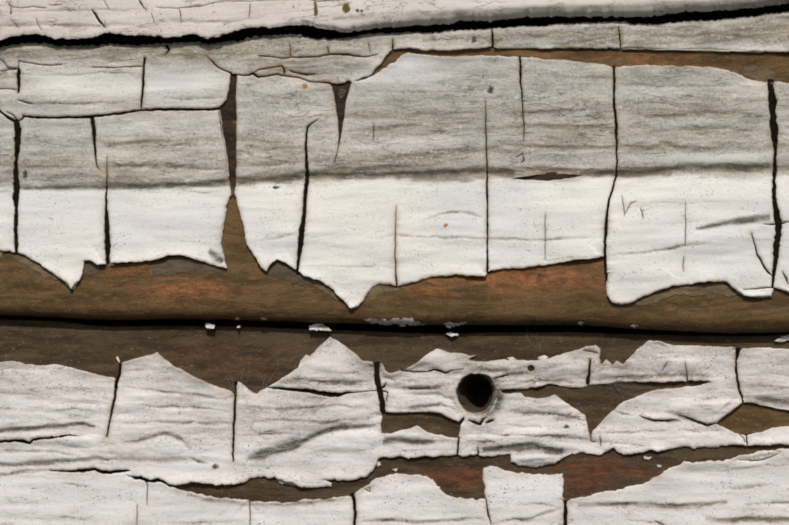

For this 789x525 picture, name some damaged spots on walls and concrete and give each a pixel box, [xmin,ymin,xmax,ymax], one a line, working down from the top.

crack [0,57,220,264]
crack [296,121,316,275]
peeling [0,11,789,332]
crack [483,123,491,273]
crack [603,27,643,284]
crack [746,79,788,290]
crack [0,434,77,444]
crack [50,468,166,494]
crack [106,364,122,437]
crack [231,381,239,462]
crack [268,361,463,415]
peeling [0,319,789,525]